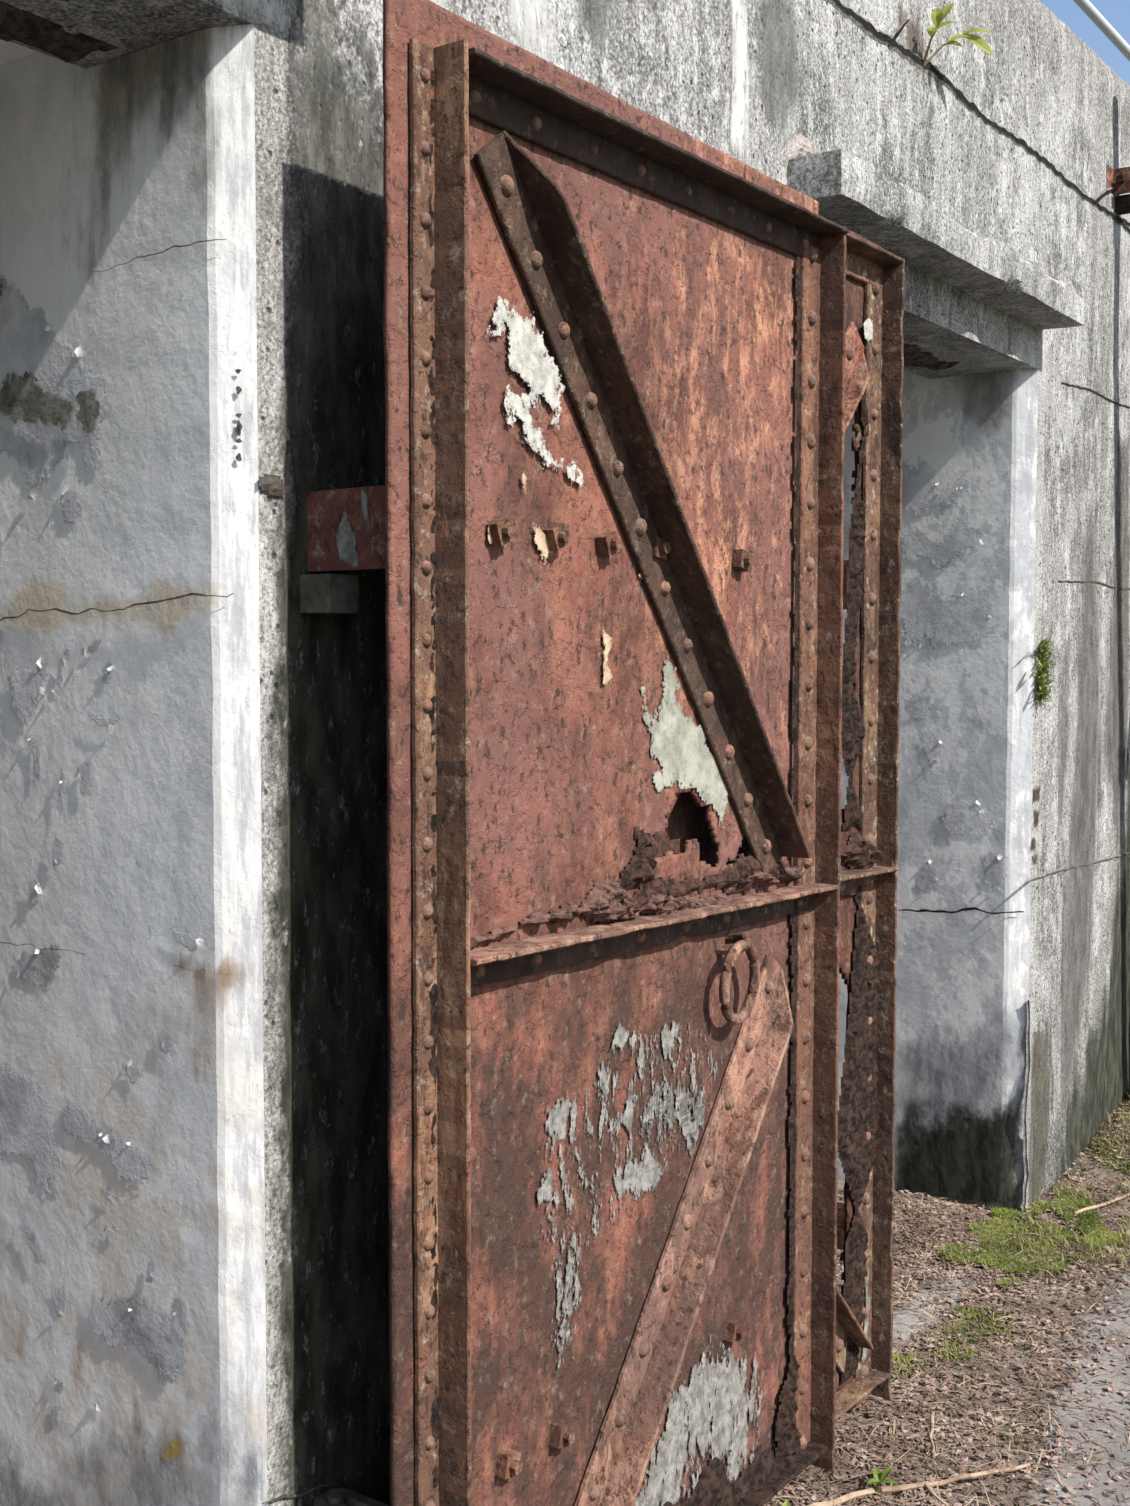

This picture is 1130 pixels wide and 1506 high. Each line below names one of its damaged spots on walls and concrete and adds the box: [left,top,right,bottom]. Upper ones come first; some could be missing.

water stain [99,28,208,207]
crack [824,0,1130,235]
peeling [0,275,113,523]
water stain [10,584,198,633]
crack [0,593,233,621]
peeling [899,460,999,651]
water stain [227,0,390,1506]
peeling [982,851,1009,891]
water stain [895,437,1130,1210]
crack [899,852,1130,914]
peeling [0,1062,157,1245]
peeling [51,1259,191,1387]